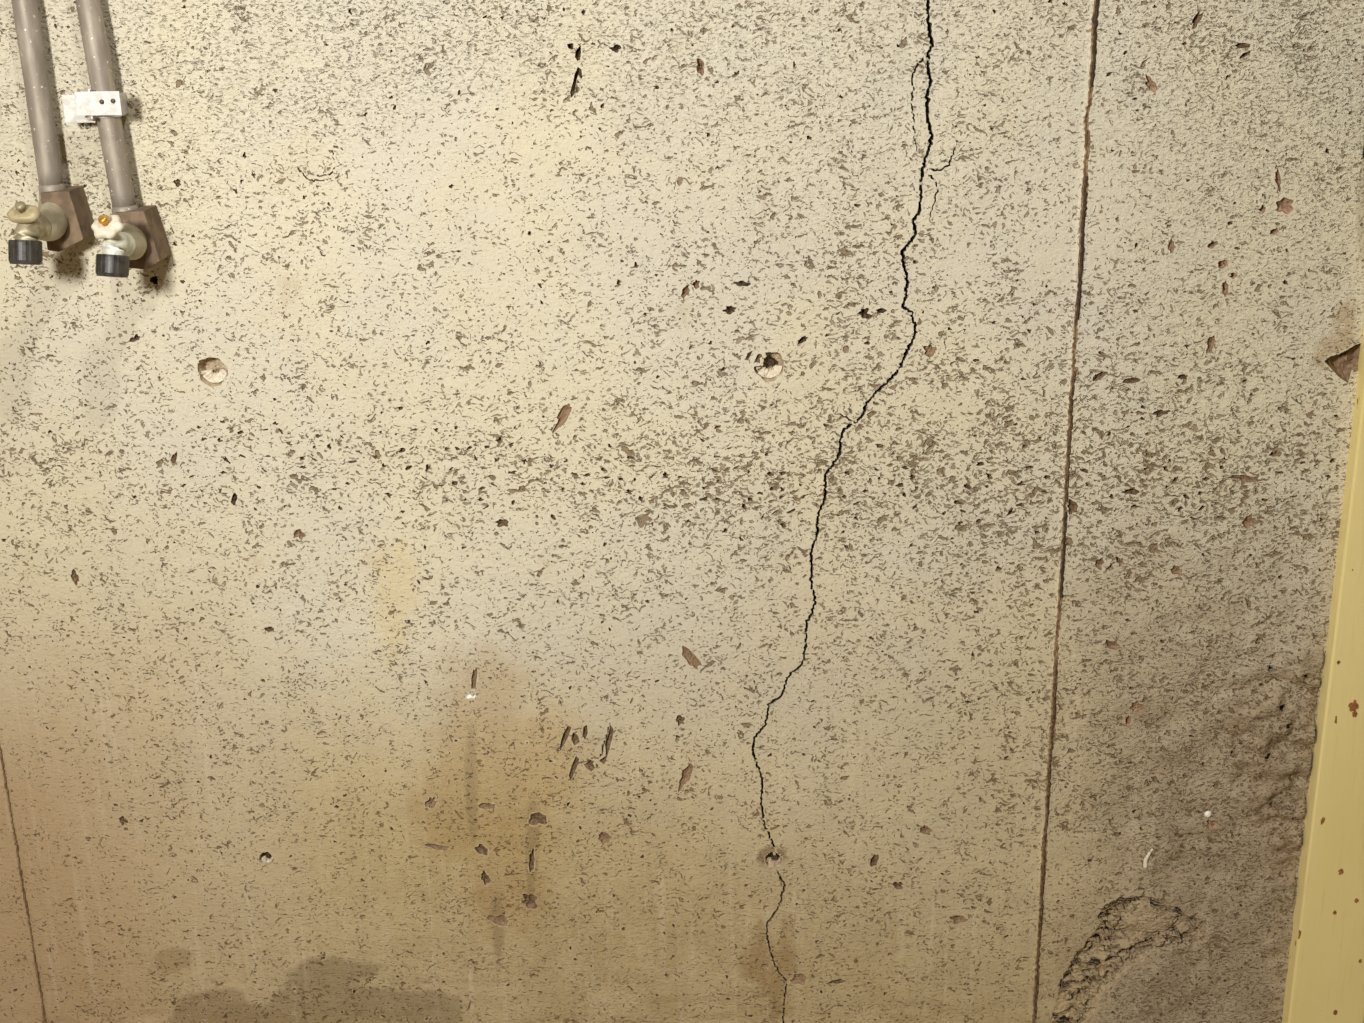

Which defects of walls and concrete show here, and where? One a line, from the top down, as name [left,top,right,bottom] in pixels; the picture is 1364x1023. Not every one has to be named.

crack [749,0,960,1023]
damp [143,941,475,1023]
spalling [1044,889,1215,1023]